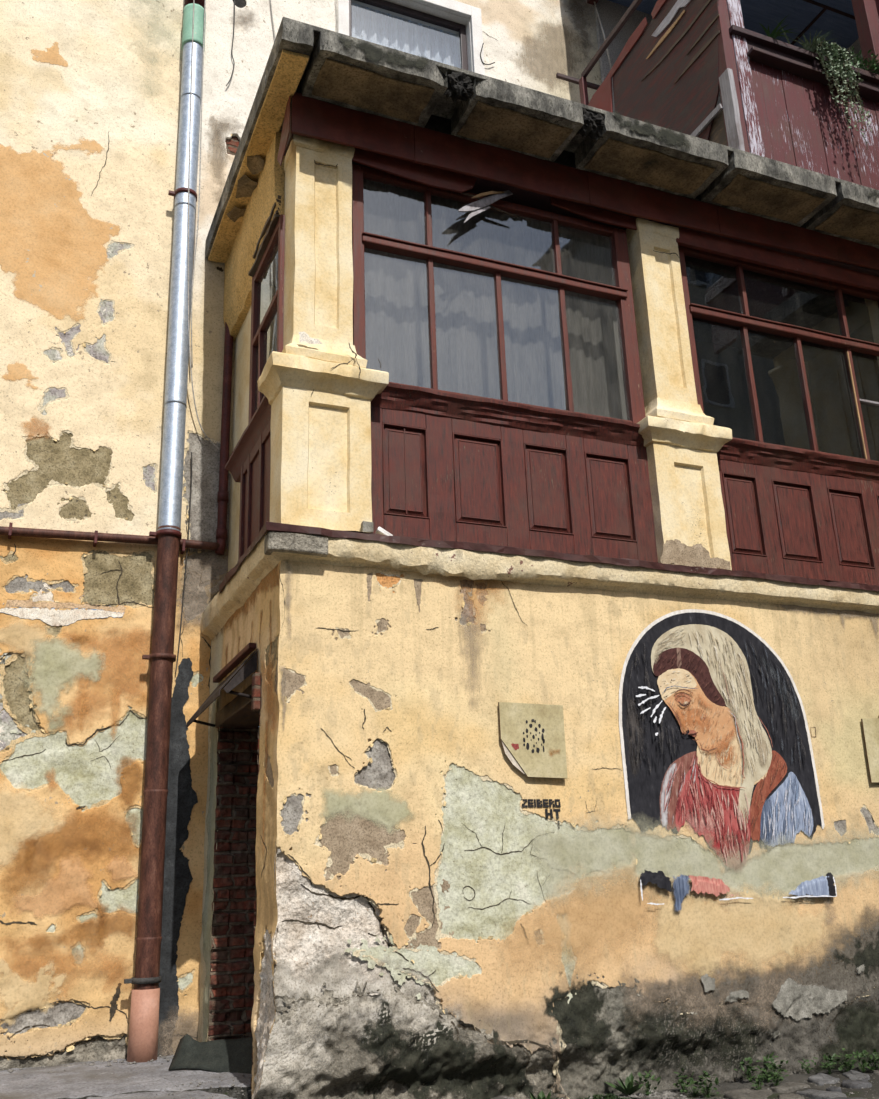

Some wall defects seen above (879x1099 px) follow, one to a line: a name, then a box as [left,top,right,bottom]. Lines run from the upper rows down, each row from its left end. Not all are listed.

damp [522,0,591,87]
peeling [0,430,135,522]
peeling [0,549,156,609]
spalling [660,539,731,570]
peeling [0,649,148,812]
spalling [354,738,397,791]
spalling [0,999,128,1071]
peeling [76,877,140,923]
crack [260,835,564,1094]
crack [421,820,607,927]
peeling [252,763,879,1099]
damp [545,912,879,1090]